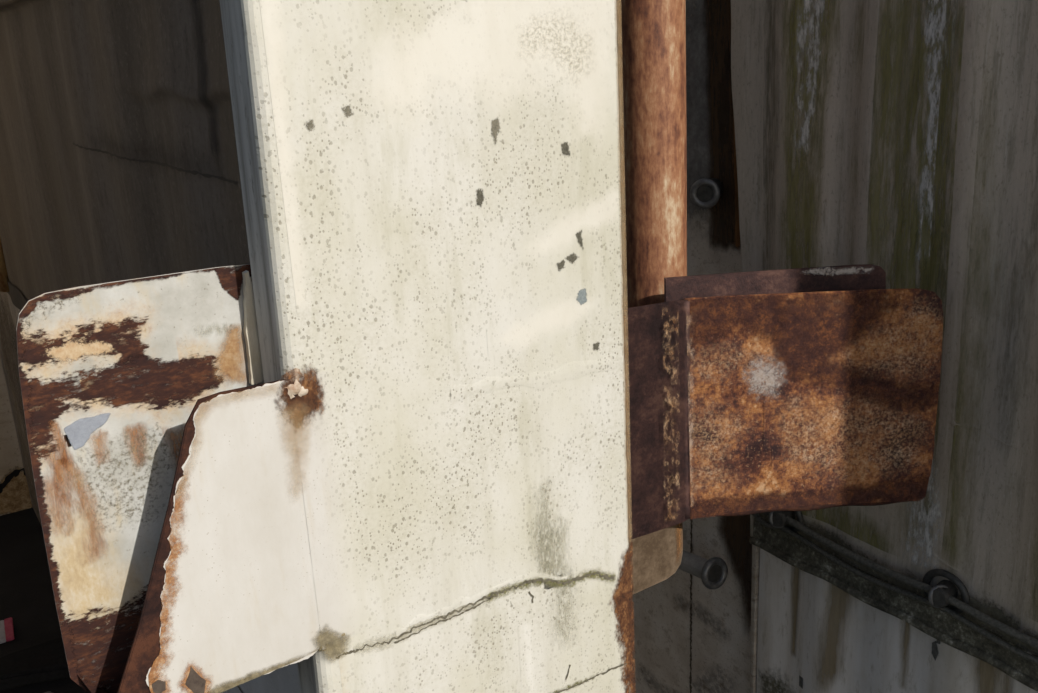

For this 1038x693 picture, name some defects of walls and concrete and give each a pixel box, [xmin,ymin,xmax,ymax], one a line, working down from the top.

water stain [795,0,824,152]
water stain [920,0,958,228]
peeling [64,413,110,450]
corrosion [17,264,251,693]
corrosion [275,368,324,429]
corrosion [677,290,943,627]
peeling [148,479,211,693]
crack [337,570,615,659]
corrosion [610,542,636,693]